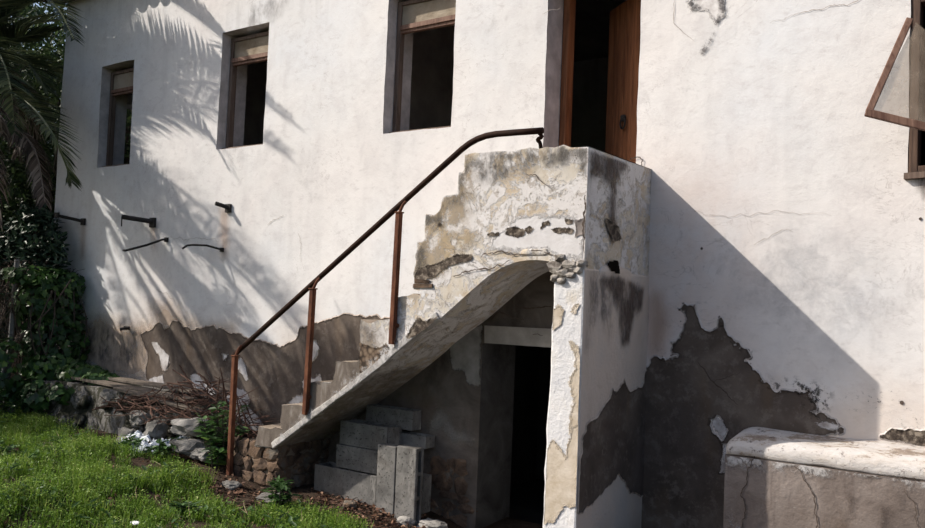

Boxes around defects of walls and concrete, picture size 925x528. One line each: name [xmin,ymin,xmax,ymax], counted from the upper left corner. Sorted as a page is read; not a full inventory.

spalling [687,0,725,54]
spalling [487,218,586,238]
spalling [414,254,472,280]
spalling [546,254,588,284]
spalling [607,260,620,274]
water stain [591,276,644,344]
peeling [140,313,390,448]
peeling [543,302,846,528]
spalling [878,427,925,447]
crack [740,456,755,528]
crack [794,466,818,528]
crack [853,472,925,528]